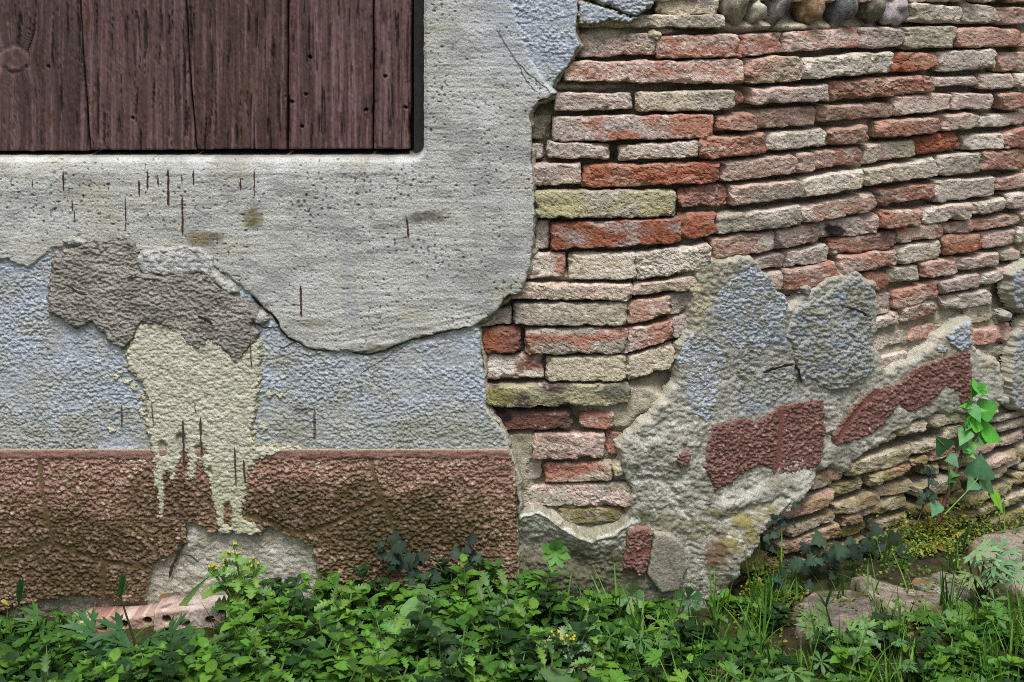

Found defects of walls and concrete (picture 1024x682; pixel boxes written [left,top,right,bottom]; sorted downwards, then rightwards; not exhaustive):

crack [496,28,550,92]
flaking render [530,0,654,129]
spalling [647,28,662,40]
corrosion [138,169,194,235]
spalling [527,148,538,276]
flaking render [137,245,240,294]
spalling [476,289,524,392]
crack [763,363,802,383]
flaking render [672,257,973,505]
flaking render [993,258,1024,417]
spalling [487,405,653,577]
spalling [0,523,322,617]